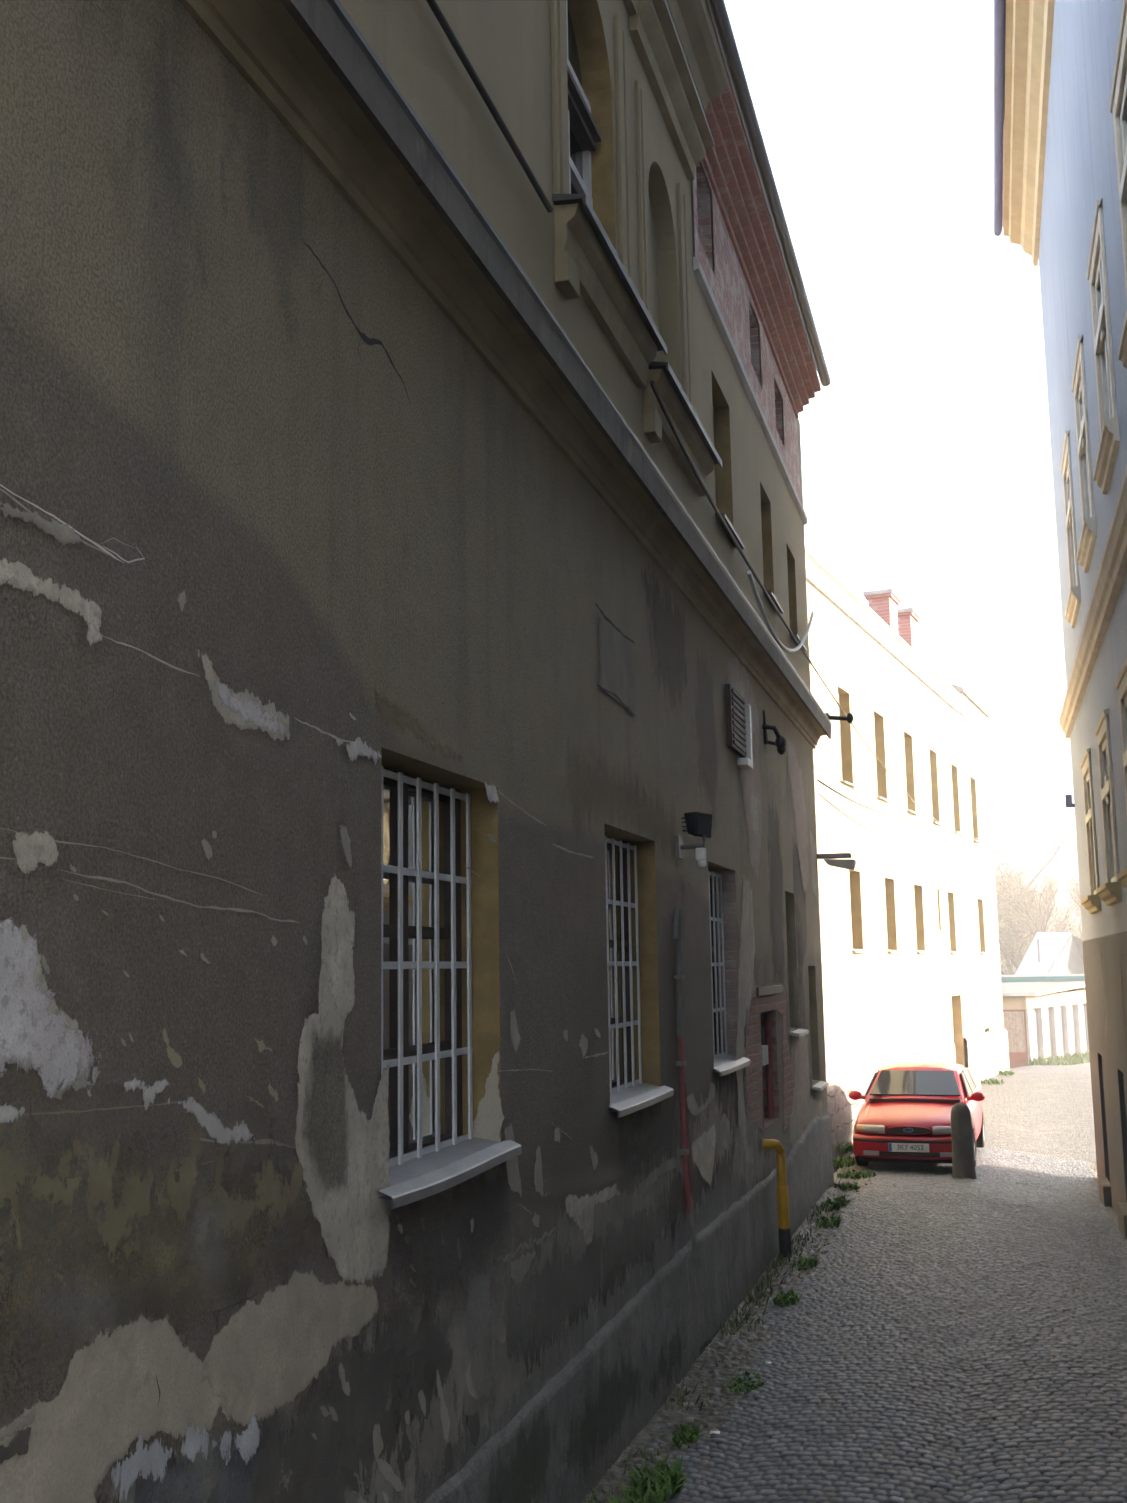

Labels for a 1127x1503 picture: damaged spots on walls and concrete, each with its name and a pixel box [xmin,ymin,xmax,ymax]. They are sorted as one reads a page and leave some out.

crack [298,183,410,402]
peeling [0,502,83,546]
peeling [86,623,103,647]
peeling [197,649,381,766]
peeling [485,782,546,826]
spalling [640,654,954,1194]
peeling [124,1029,255,1146]
peeling [295,825,391,1285]
peeling [339,1009,620,1503]
spalling [0,1410,35,1440]
peeling [320,1343,370,1422]